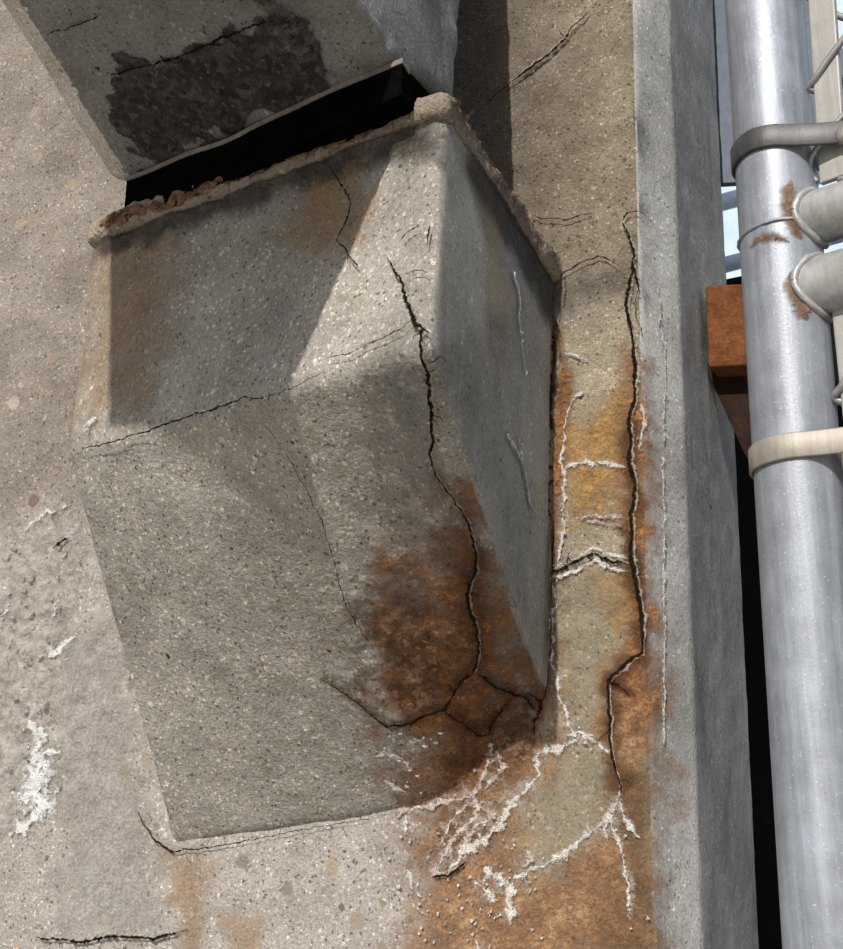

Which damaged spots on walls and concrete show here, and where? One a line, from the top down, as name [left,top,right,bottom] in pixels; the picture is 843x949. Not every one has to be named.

spalling [105,0,330,173]
crack [486,11,589,102]
spalling [99,129,372,228]
crack [328,165,359,268]
crack [84,210,650,791]
leakage [367,390,641,949]
rust [371,354,666,949]
leakage [9,613,155,924]
crack [138,812,371,861]
crack [34,928,188,949]